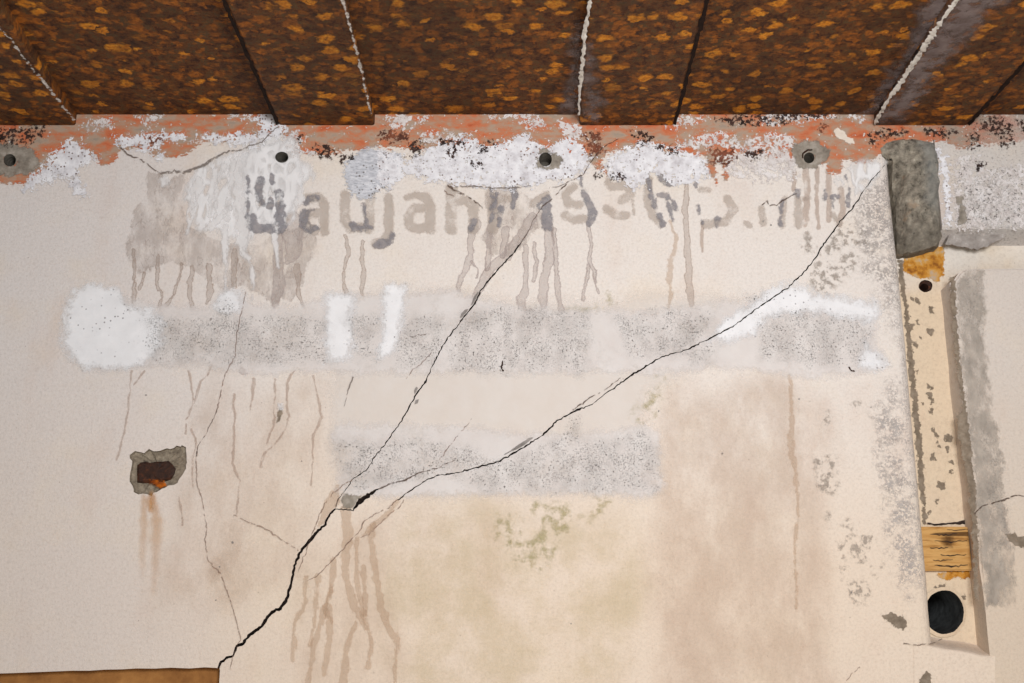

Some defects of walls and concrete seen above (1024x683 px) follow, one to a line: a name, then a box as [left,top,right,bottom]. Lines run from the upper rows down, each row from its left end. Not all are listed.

spalling [130,446,187,496]
water stain [127,134,325,375]
water stain [452,212,586,371]
crack [195,139,885,668]
water stain [484,419,659,491]
water stain [581,224,600,301]
water stain [620,185,712,360]
peeling [909,320,934,347]
rust [903,246,945,282]
spalling [927,277,980,601]